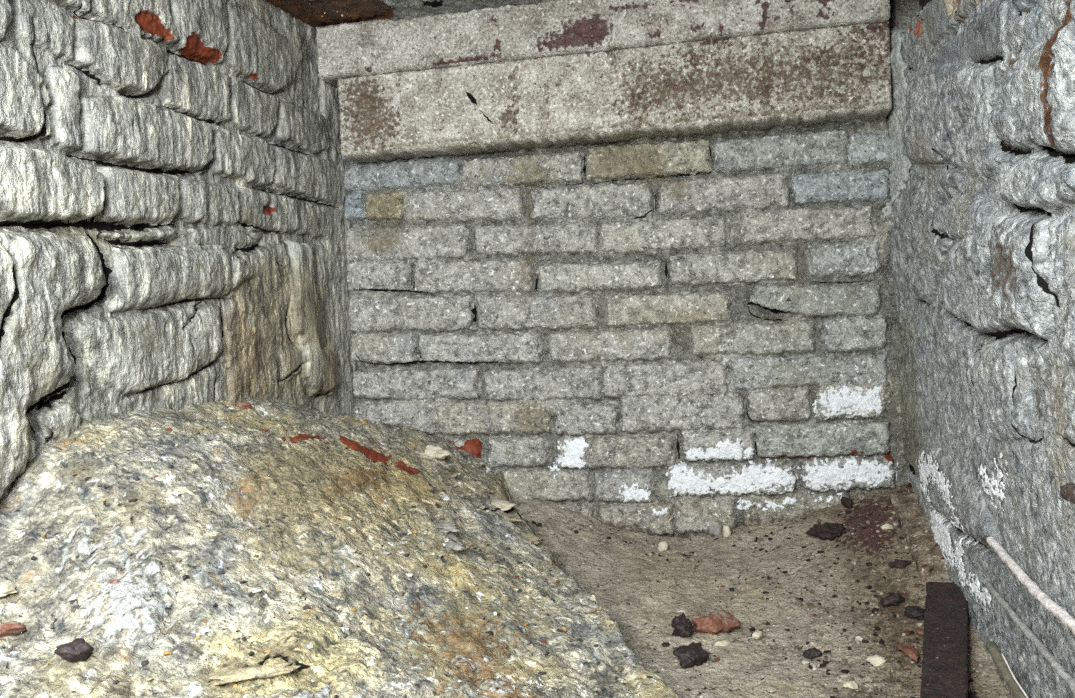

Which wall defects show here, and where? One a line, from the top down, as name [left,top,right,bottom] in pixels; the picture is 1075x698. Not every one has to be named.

spalling [135,10,174,42]
corrosion [266,0,396,30]
spalling [178,32,222,64]
corrosion [498,61,522,133]
corrosion [537,0,891,128]
corrosion [1036,0,1072,154]
crack [810,278,872,286]
crack [747,301,791,321]
damp [812,379,890,426]
damp [548,436,589,479]
damp [619,438,899,530]
damp [601,522,709,538]